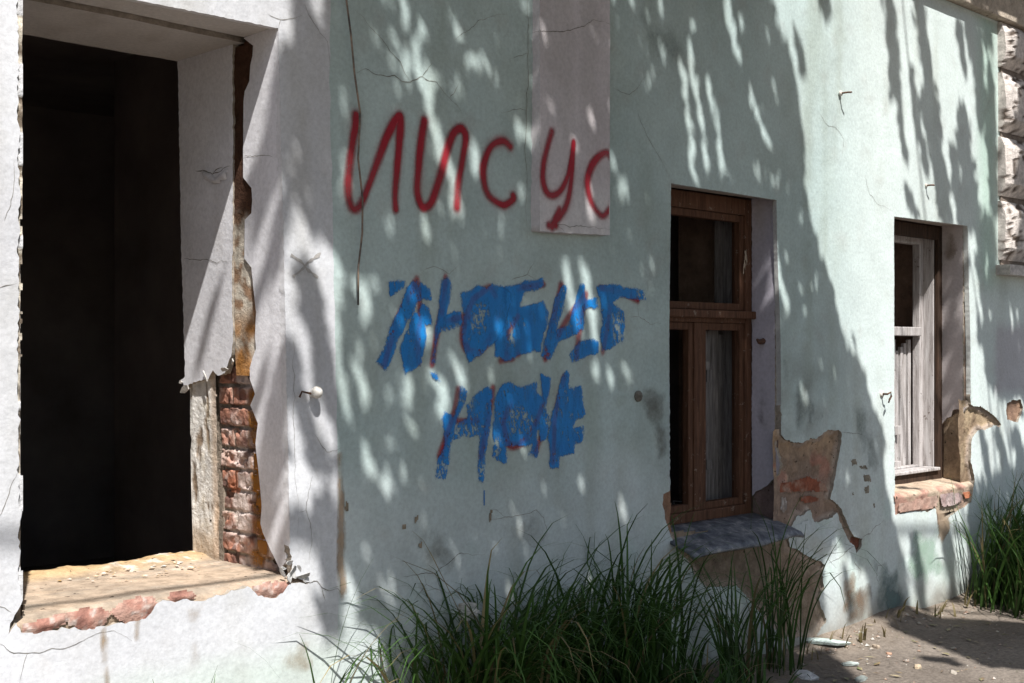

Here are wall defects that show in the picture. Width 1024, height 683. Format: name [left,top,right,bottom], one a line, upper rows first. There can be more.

crack [357,12,458,102]
flaking render [203,358,310,598]
flaking render [753,429,875,550]
flaking render [898,399,1023,512]
spalling [14,562,196,634]